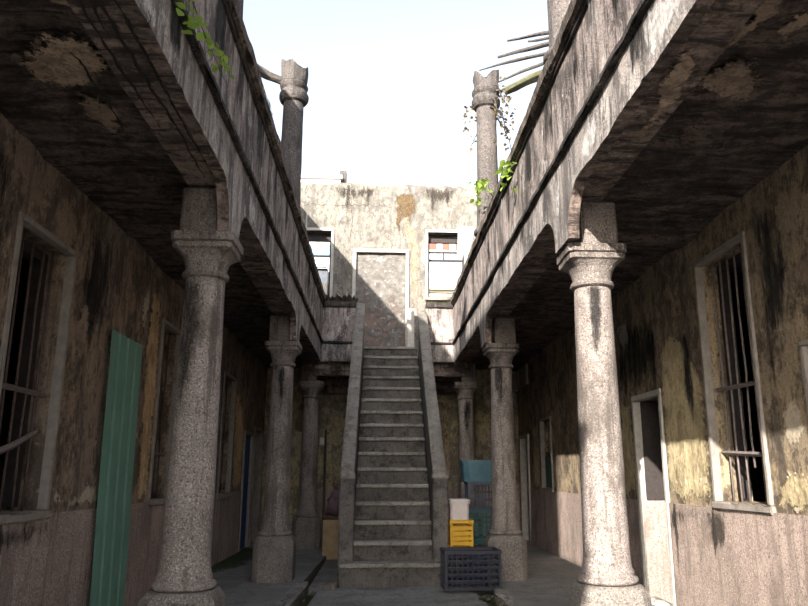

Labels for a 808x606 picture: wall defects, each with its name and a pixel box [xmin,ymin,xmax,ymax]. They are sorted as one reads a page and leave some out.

spalling [10,30,126,137]
spalling [637,48,696,142]
spalling [698,0,783,104]
spalling [773,9,808,42]
leakage [683,334,694,414]
leakage [708,510,725,554]
peeling [778,471,808,513]